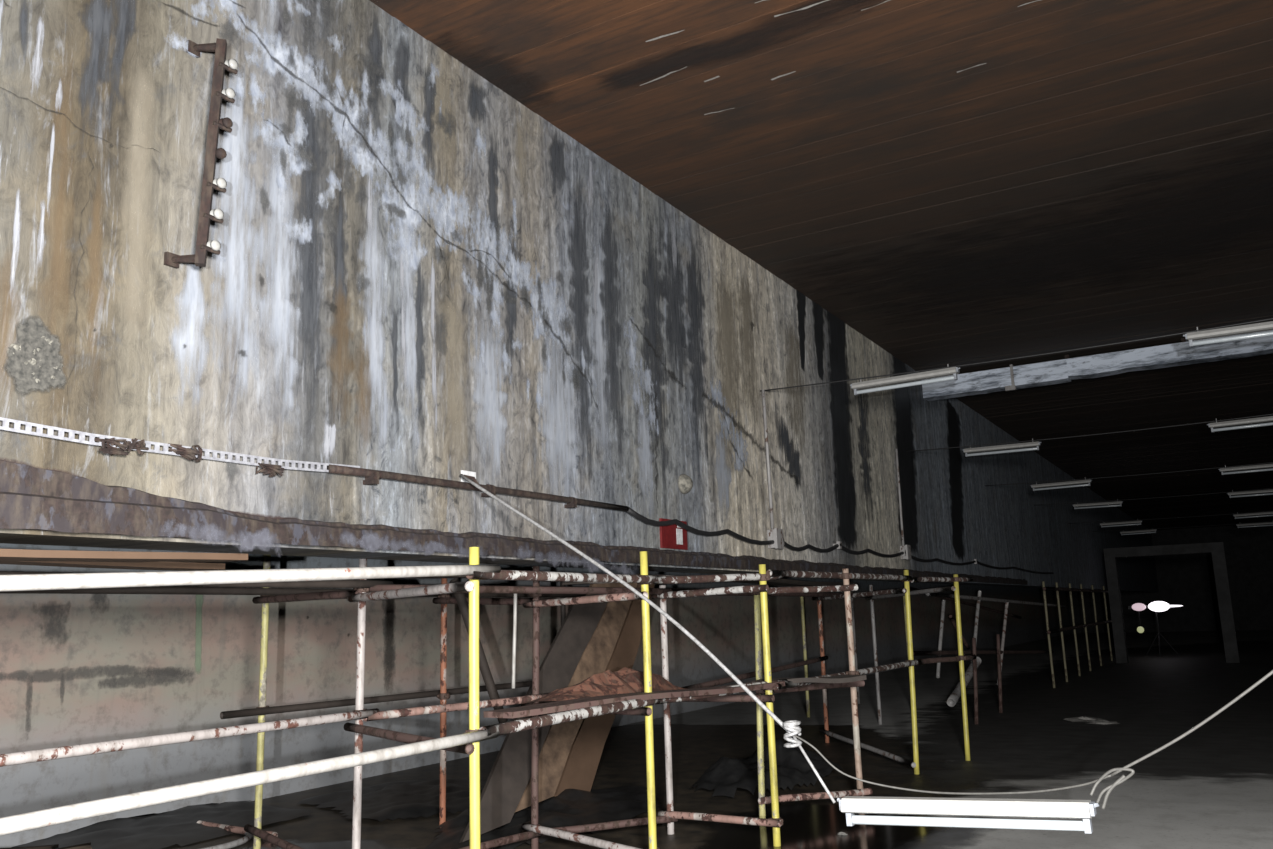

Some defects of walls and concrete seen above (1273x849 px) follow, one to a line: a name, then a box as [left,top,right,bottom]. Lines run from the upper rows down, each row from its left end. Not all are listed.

damp [20,3,44,87]
damp [606,0,890,88]
damp [11,192,20,283]
damp [37,128,55,259]
damp [125,79,153,316]
crack [164,3,598,407]
damp [172,0,754,507]
spalling [4,316,66,395]
crack [631,319,799,507]
damp [775,289,873,548]
damp [167,523,278,551]
damp [342,533,483,558]